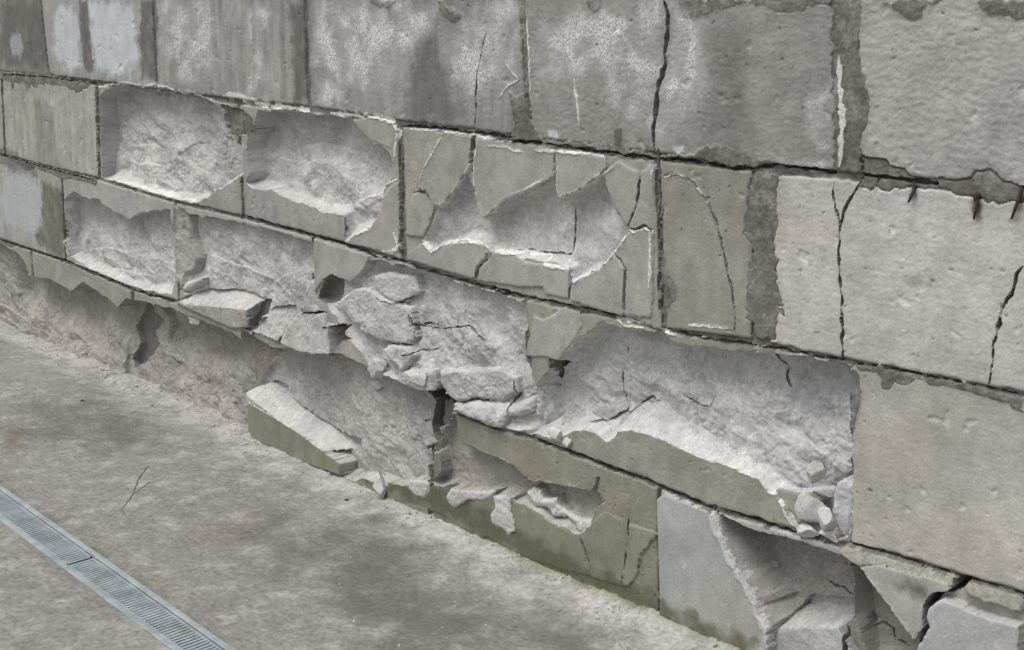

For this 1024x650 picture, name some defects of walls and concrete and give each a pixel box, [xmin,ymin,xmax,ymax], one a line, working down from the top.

spalling [99,84,654,318]
crack [398,155,436,253]
crack [469,33,486,171]
crack [474,207,577,299]
crack [615,256,627,311]
crack [627,0,736,332]
crack [831,154,869,358]
crack [988,266,1024,386]
spalling [0,191,1024,650]